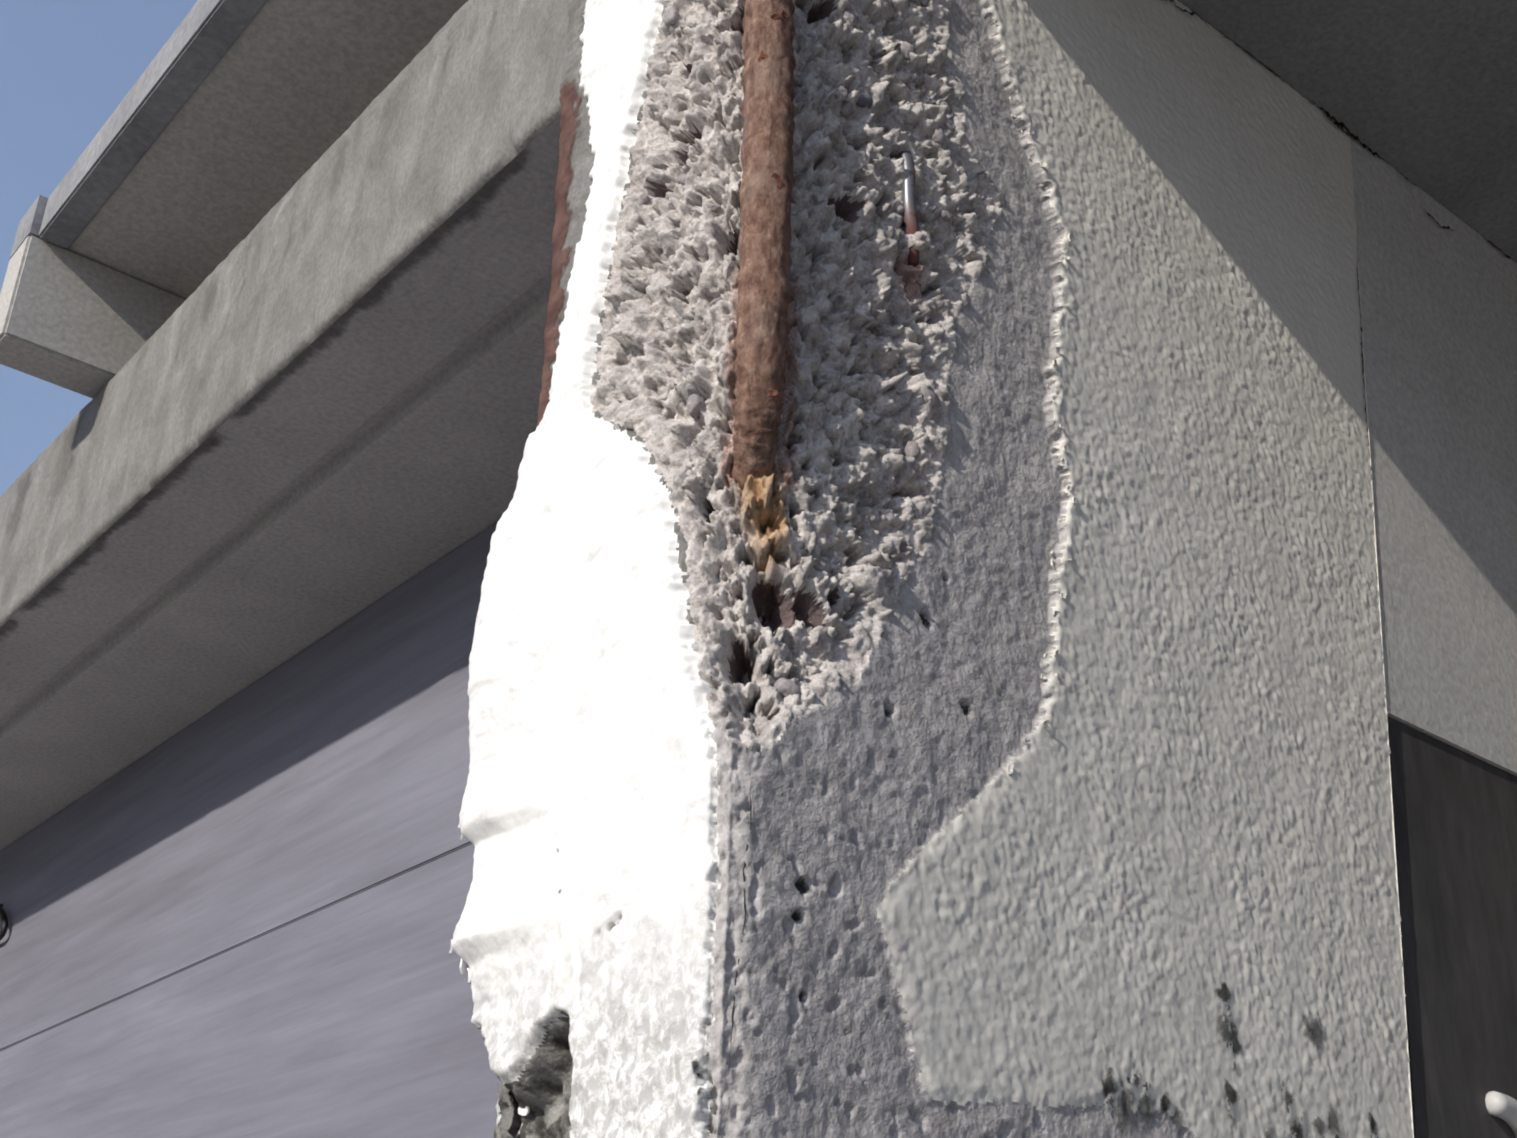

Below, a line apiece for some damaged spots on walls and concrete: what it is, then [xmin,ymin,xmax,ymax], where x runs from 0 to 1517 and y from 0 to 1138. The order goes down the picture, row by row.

rust [743,473,788,572]
spalling [590,0,1198,1138]
damp [1216,982,1241,1127]
damp [1304,1012,1323,1048]
damp [1102,1068,1182,1130]
damp [1265,1082,1340,1138]
damp [1368,1113,1378,1138]